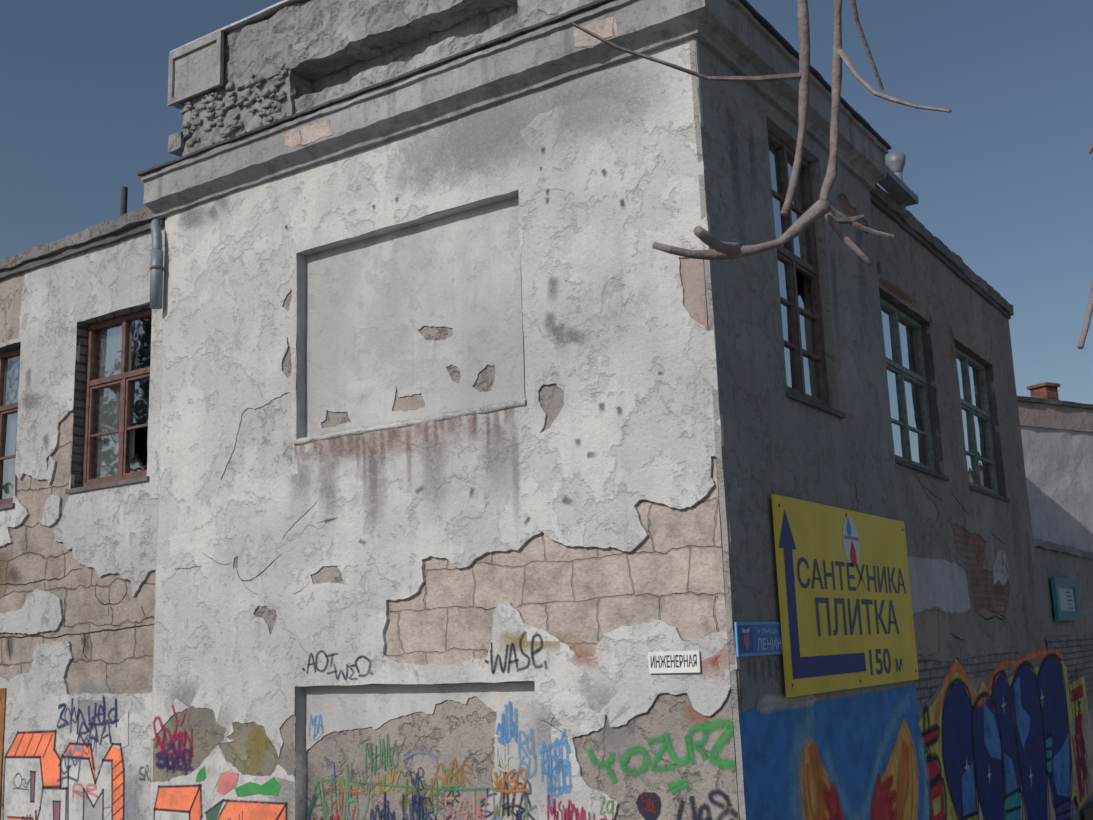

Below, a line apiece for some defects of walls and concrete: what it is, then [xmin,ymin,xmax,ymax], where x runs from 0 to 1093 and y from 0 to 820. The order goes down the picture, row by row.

peeling [0,271,26,343]
peeling [419,326,453,340]
peeling [680,258,709,330]
peeling [447,365,461,384]
peeling [473,365,496,392]
spalling [540,384,565,432]
peeling [0,411,156,694]
peeling [311,566,344,584]
peeling [385,457,735,665]
peeling [907,524,1022,705]
peeling [152,696,497,820]
peeling [574,669,740,820]